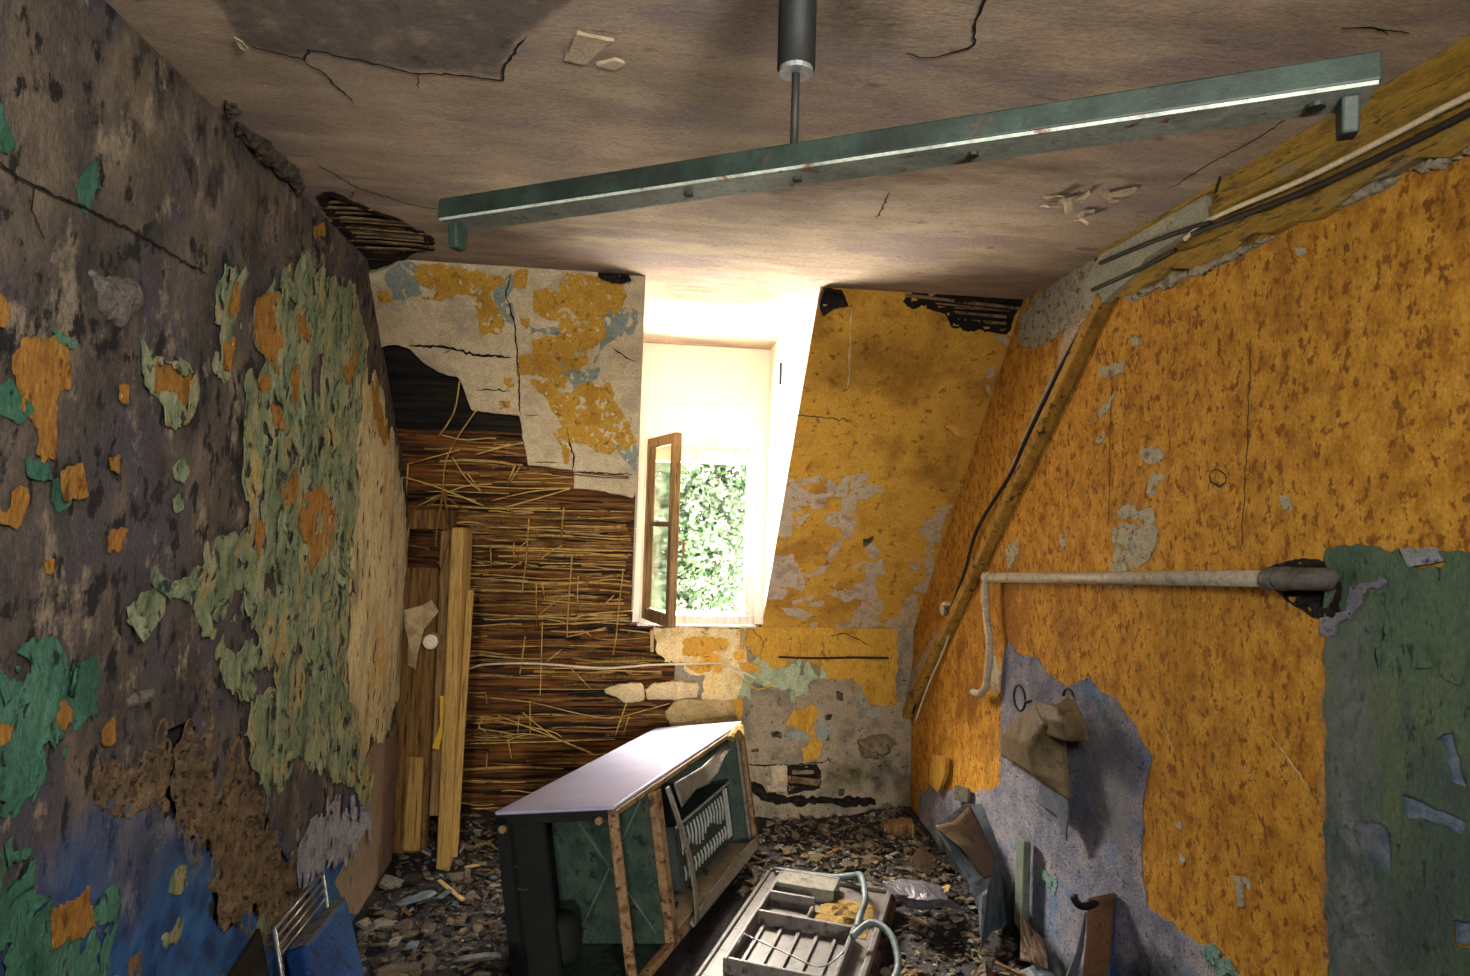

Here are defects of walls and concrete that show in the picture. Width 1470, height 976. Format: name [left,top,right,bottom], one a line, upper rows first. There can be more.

crack [251,35,527,103]
crack [907,0,986,58]
crack [409,271,533,416]
spalling [818,287,849,316]
flaking render [897,257,1098,474]
peeling [0,97,436,976]
peeling [767,472,953,630]
flaking render [1110,446,1165,590]
peeling [738,656,881,743]
spalling [751,764,876,808]
flaking render [919,641,1231,976]
peeling [1270,544,1470,976]